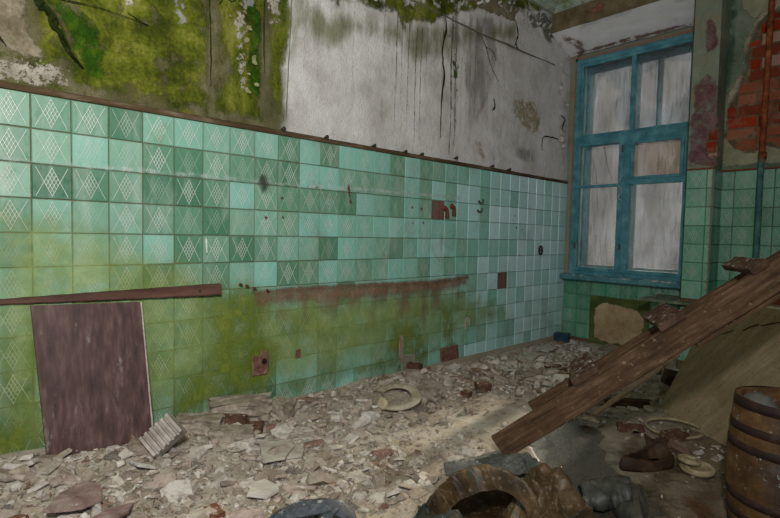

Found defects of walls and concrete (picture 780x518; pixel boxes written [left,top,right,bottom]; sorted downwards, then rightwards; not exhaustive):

flaking render [0,0,70,87]
crack [34,0,150,69]
crack [209,0,235,86]
crack [260,0,268,73]
crack [411,0,555,136]
flaking render [688,0,780,167]
peeling [432,200,444,219]
corrosion [258,276,468,306]
peeling [497,272,507,289]
peeling [588,295,651,347]